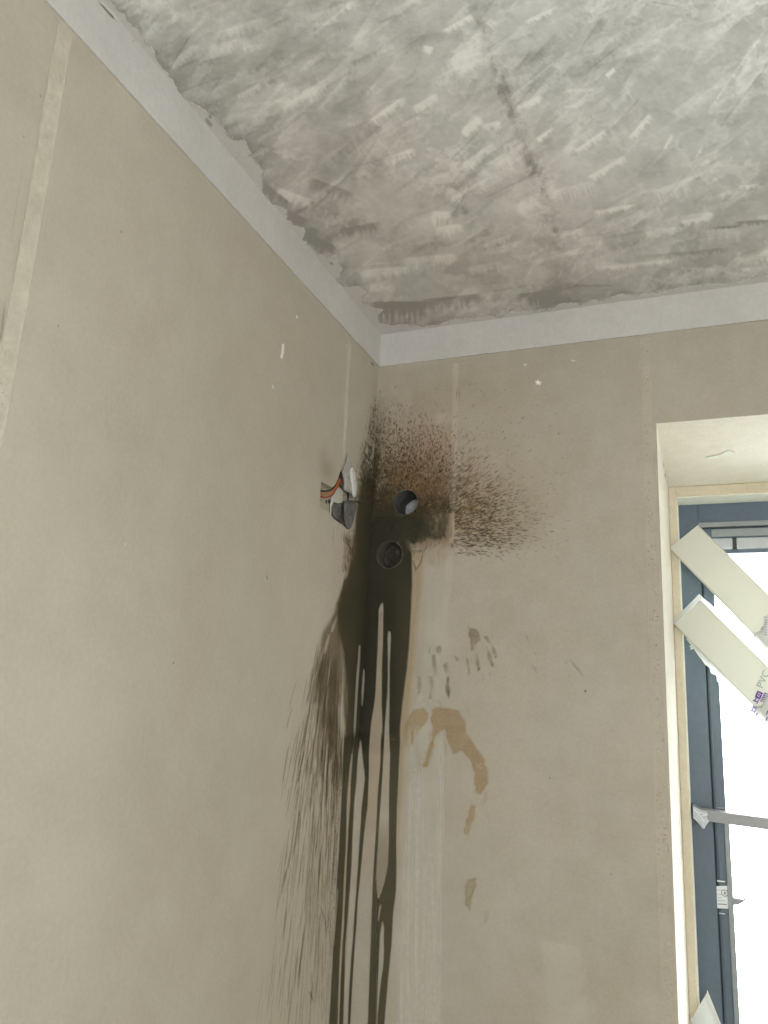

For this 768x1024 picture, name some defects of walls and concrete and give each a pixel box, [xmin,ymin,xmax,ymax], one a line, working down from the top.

leakage [282,399,552,1024]